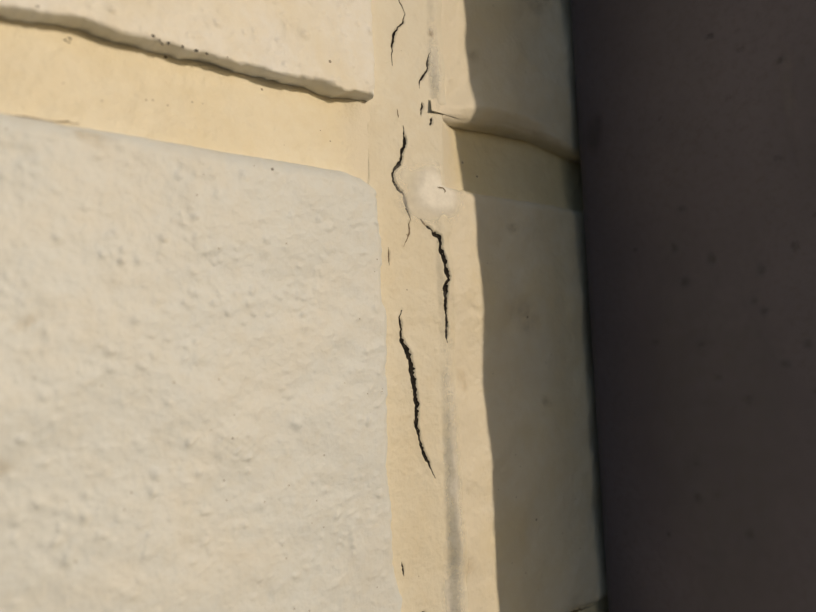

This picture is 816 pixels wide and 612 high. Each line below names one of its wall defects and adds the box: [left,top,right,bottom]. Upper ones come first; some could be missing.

crack [391,1,405,66]
crack [419,53,432,125]
crack [388,110,452,340]
crack [398,310,435,478]